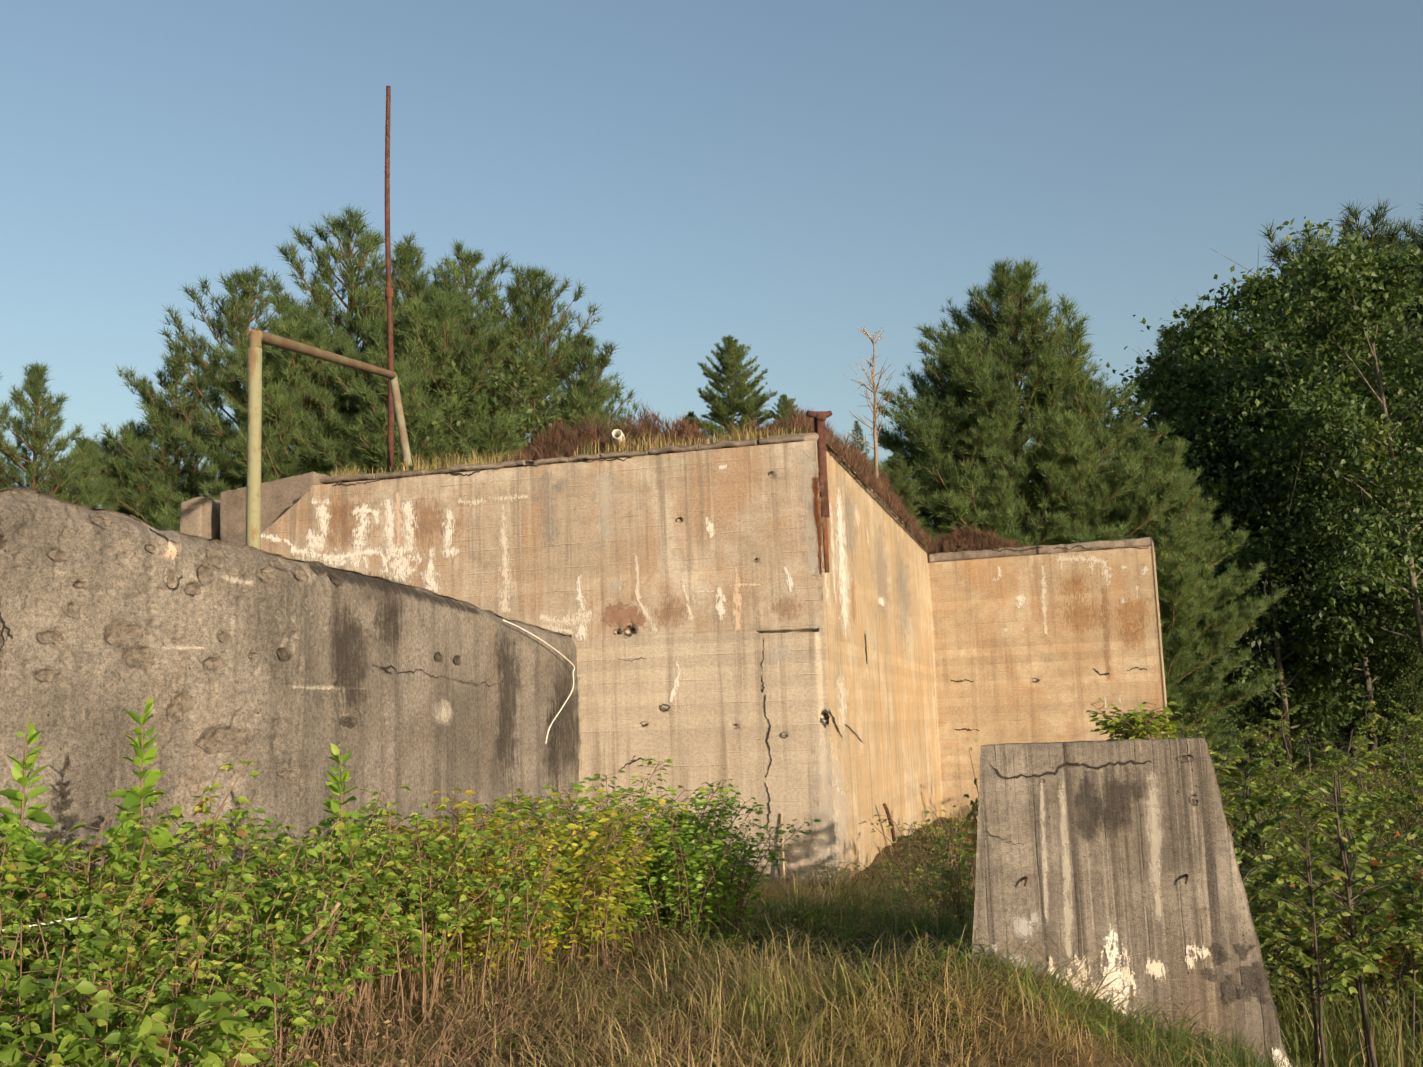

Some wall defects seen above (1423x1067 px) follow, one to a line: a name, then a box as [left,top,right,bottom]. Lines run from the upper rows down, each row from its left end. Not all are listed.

rust [812,477,823,574]
spalling [145,541,227,596]
damp [261,491,529,707]
spalling [37,630,65,644]
spalling [103,618,155,670]
crack [373,665,503,687]
spalling [196,723,253,755]
damp [545,656,581,789]
crack [761,639,781,881]
crack [990,760,1151,779]
efflorescence [1047,924,1166,1021]
damp [1184,942,1211,969]